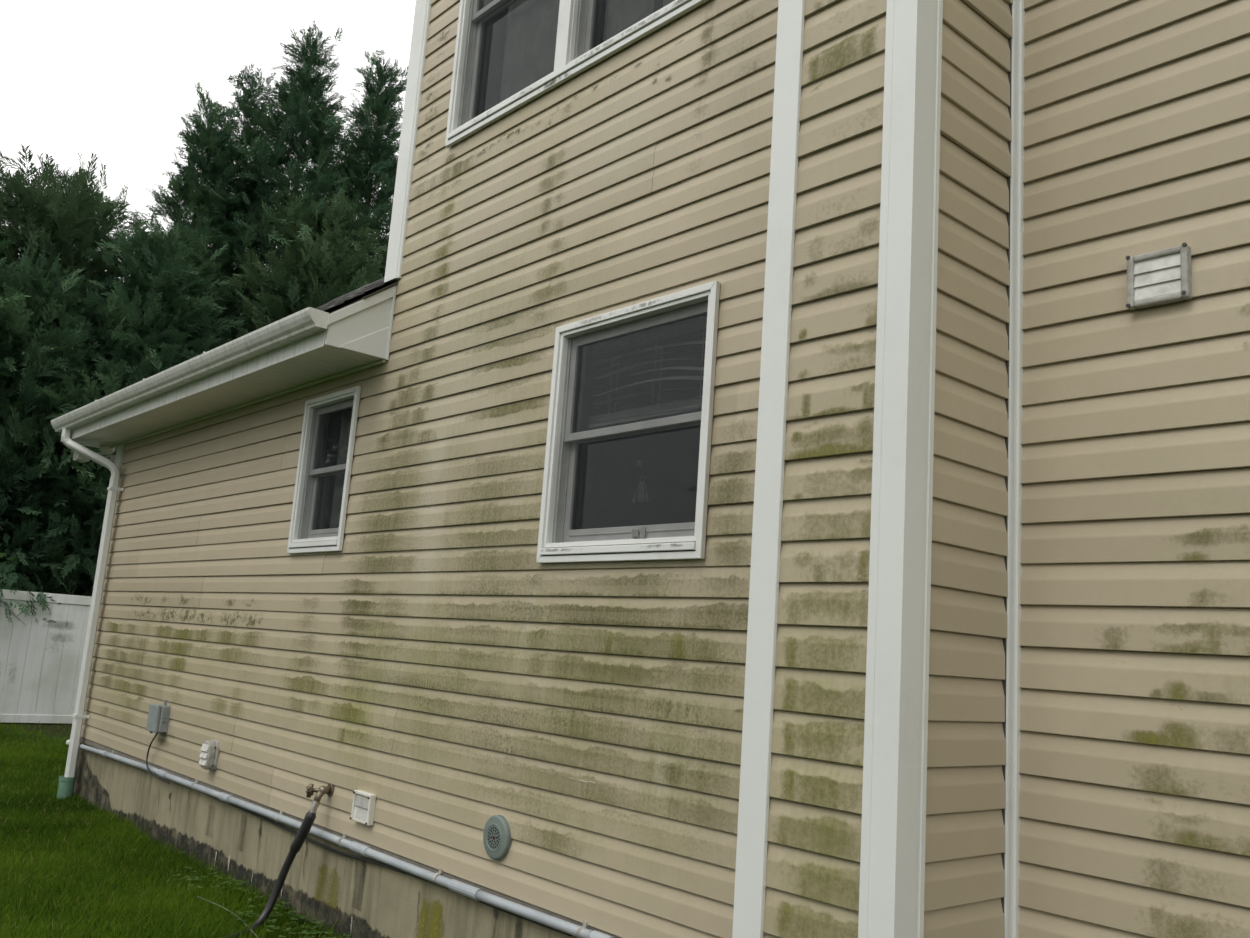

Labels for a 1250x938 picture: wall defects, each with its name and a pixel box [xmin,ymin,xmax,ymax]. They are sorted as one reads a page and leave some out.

leakage [159,598,255,671]
leakage [345,580,371,678]
leakage [557,594,649,704]
leakage [1133,724,1194,748]